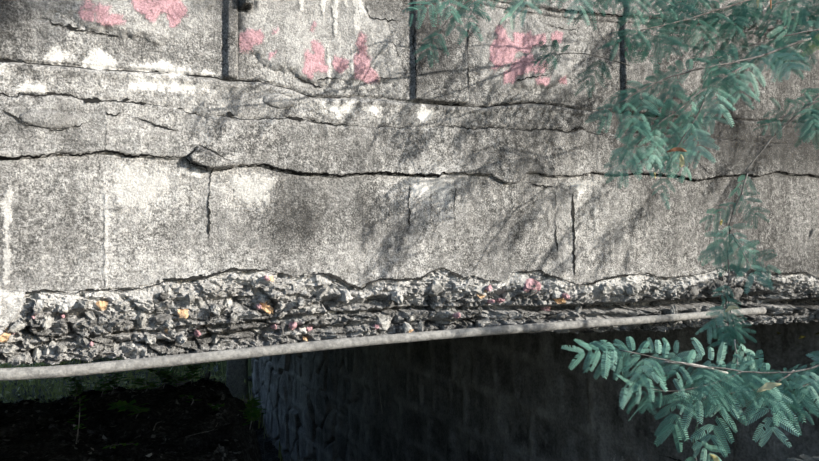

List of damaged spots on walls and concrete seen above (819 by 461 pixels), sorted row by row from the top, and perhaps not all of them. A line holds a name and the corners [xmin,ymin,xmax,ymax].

crack [40,17,123,39]
crack [0,58,376,99]
crack [364,1,417,101]
crack [554,9,637,31]
crack [0,92,819,294]
damp [0,189,26,309]
spalling [0,266,819,366]